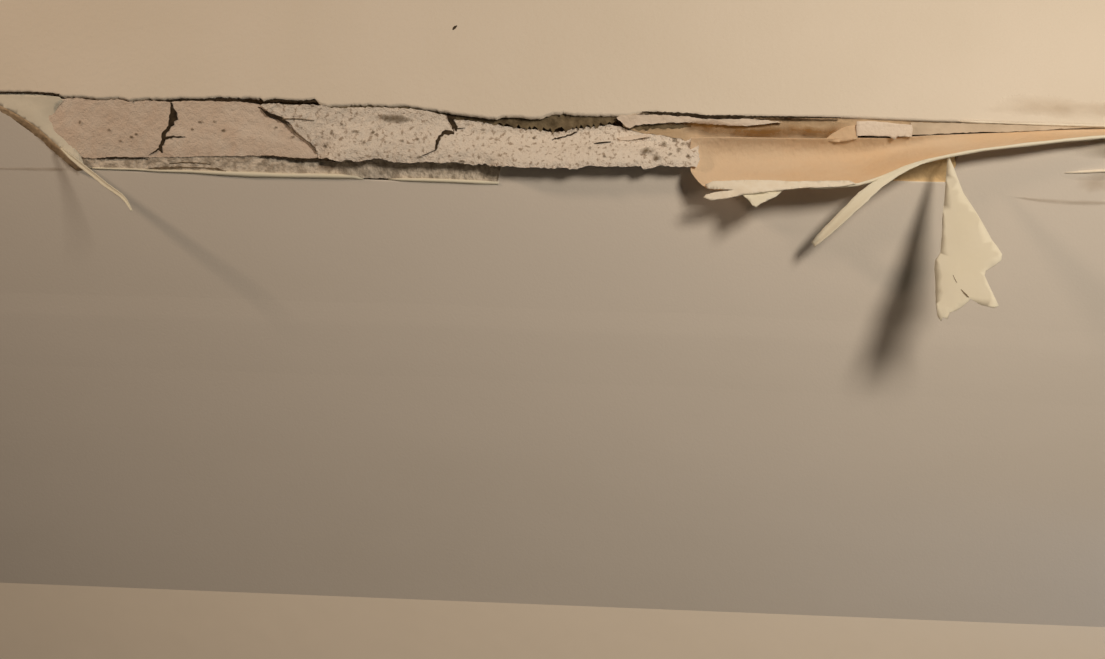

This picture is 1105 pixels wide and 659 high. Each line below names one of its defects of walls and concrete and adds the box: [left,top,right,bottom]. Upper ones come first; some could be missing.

crack [0,91,1014,171]
flaking render [0,93,1105,321]